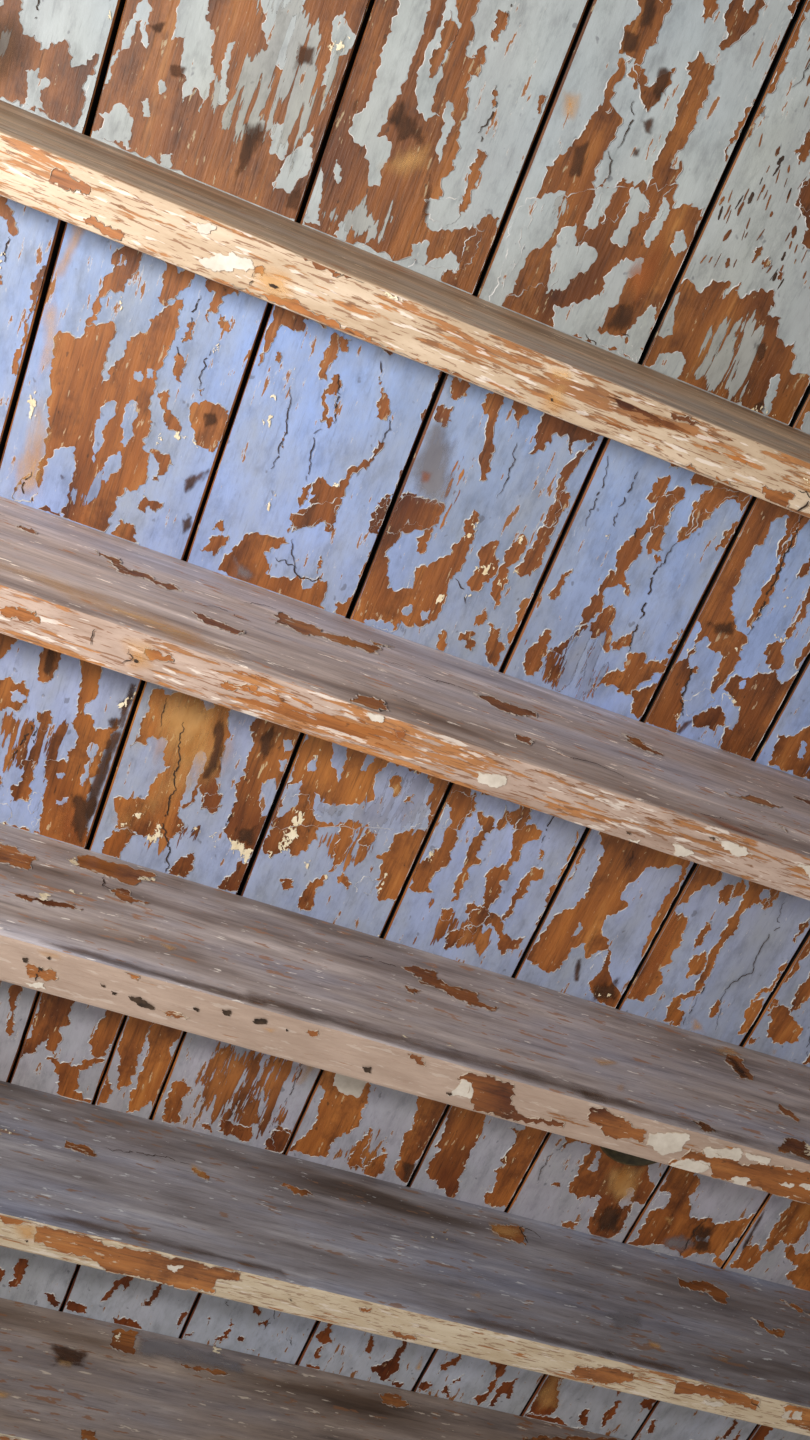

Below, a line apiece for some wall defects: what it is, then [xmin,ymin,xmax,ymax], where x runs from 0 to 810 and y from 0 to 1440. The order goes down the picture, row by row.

peeling [0,0,810,434]
peeling [11,215,810,779]
peeling [0,606,40,659]
peeling [0,647,782,1027]
peeling [723,918,810,1081]
peeling [5,963,810,1316]
peeling [0,1215,256,1376]
peeling [306,1323,334,1370]
peeling [365,1329,464,1408]
peeling [472,1361,519,1407]
peeling [521,1365,635,1440]
peeling [673,1381,810,1440]